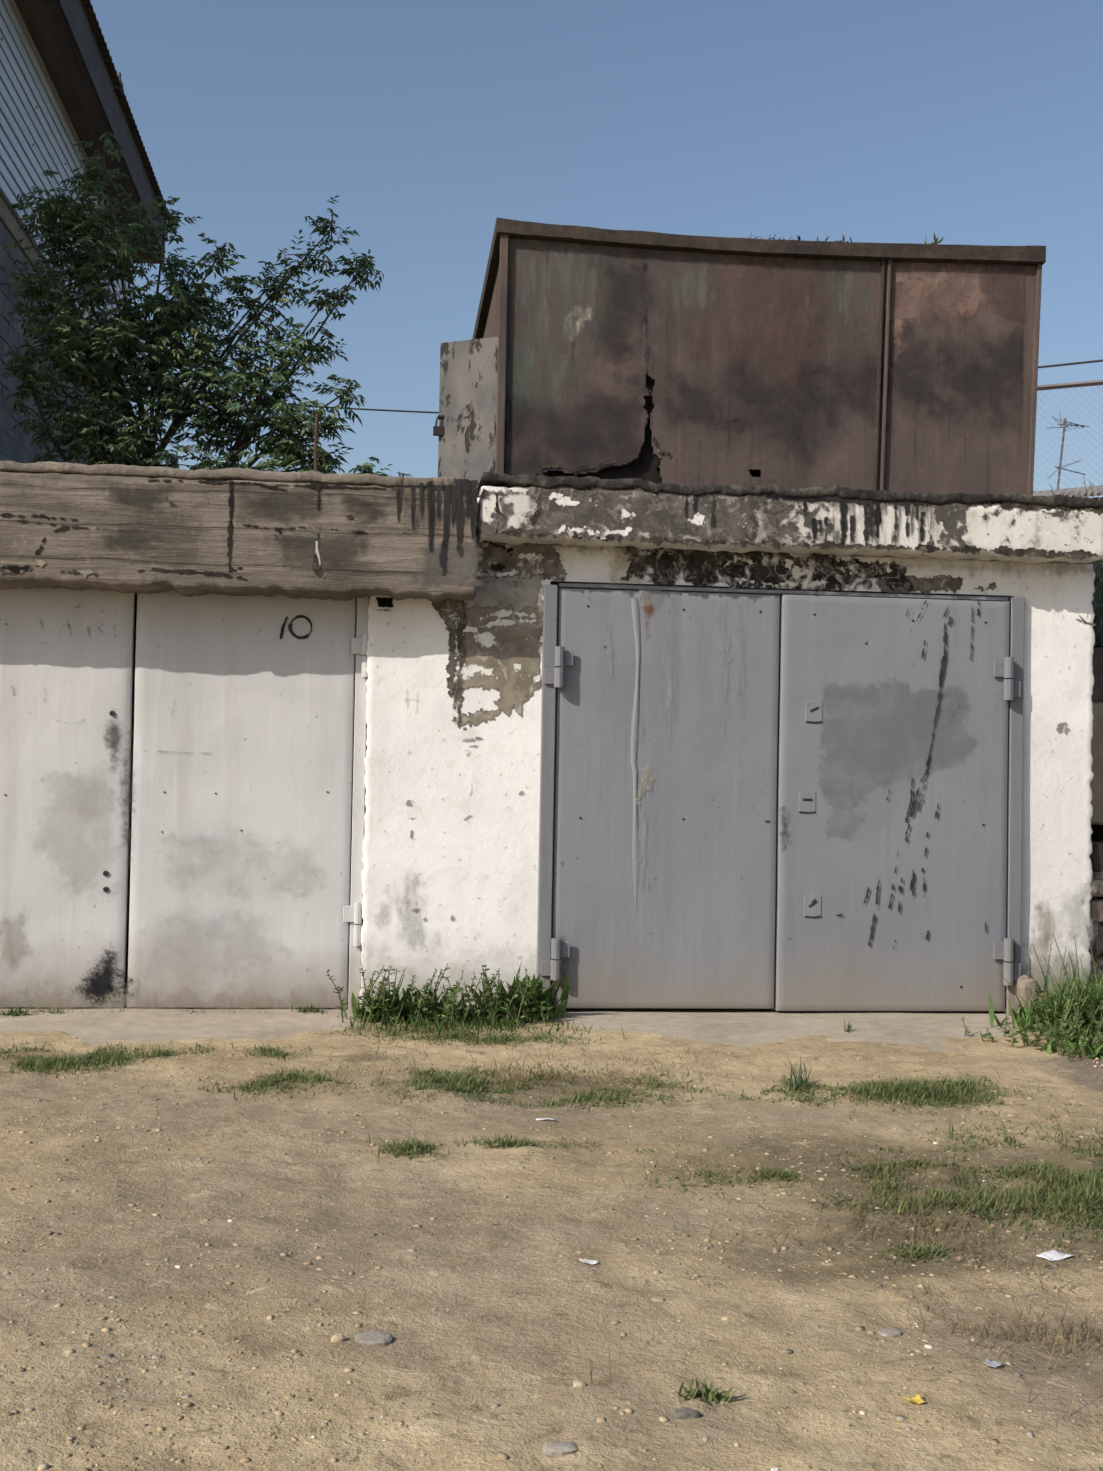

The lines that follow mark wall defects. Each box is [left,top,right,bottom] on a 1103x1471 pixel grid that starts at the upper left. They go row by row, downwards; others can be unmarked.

rust [890,262,1025,350]
water stain [251,491,364,569]
peeling [431,487,997,756]